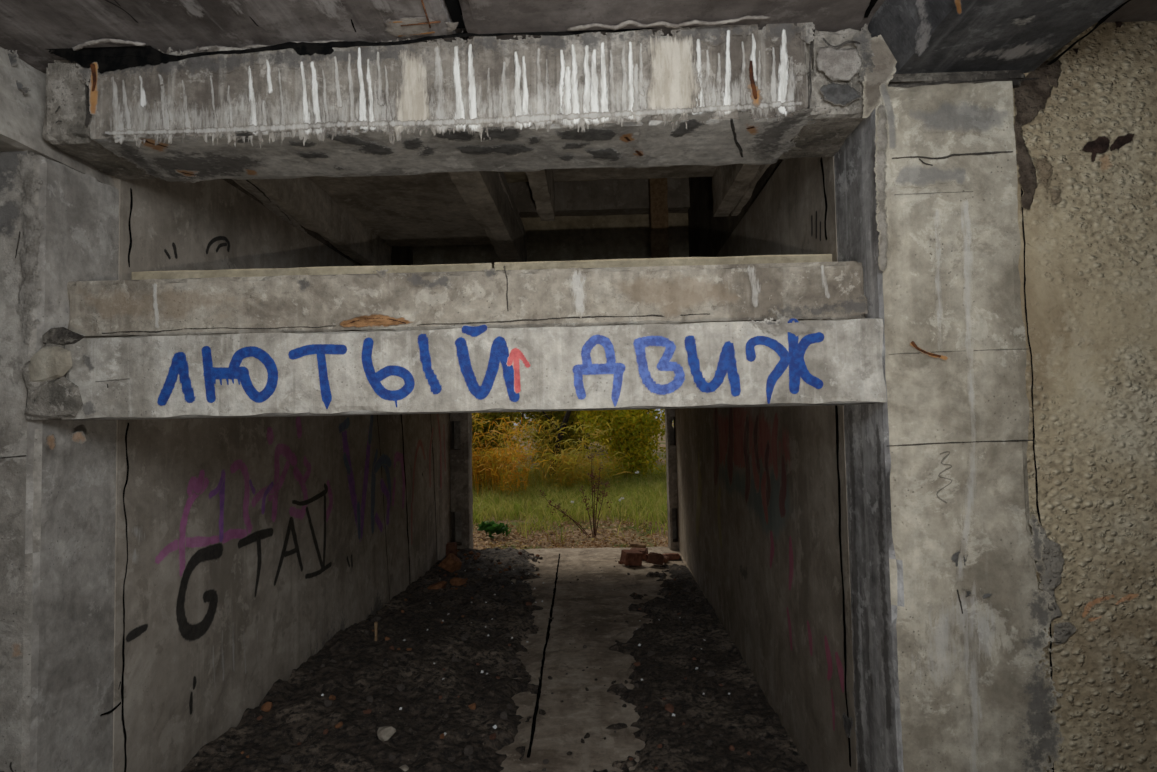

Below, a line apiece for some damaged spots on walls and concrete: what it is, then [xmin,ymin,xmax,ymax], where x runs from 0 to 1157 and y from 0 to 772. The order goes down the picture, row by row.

rust [89,62,99,115]
water stain [101,29,820,183]
crack [47,0,878,128]
rust [747,60,763,108]
crack [892,130,1023,166]
flaking render [1013,58,1062,210]
flaking render [1082,133,1135,174]
spalling [339,313,414,328]
rust [909,341,949,360]
crack [887,188,1042,526]
crack [100,423,129,772]
crack [527,554,560,758]